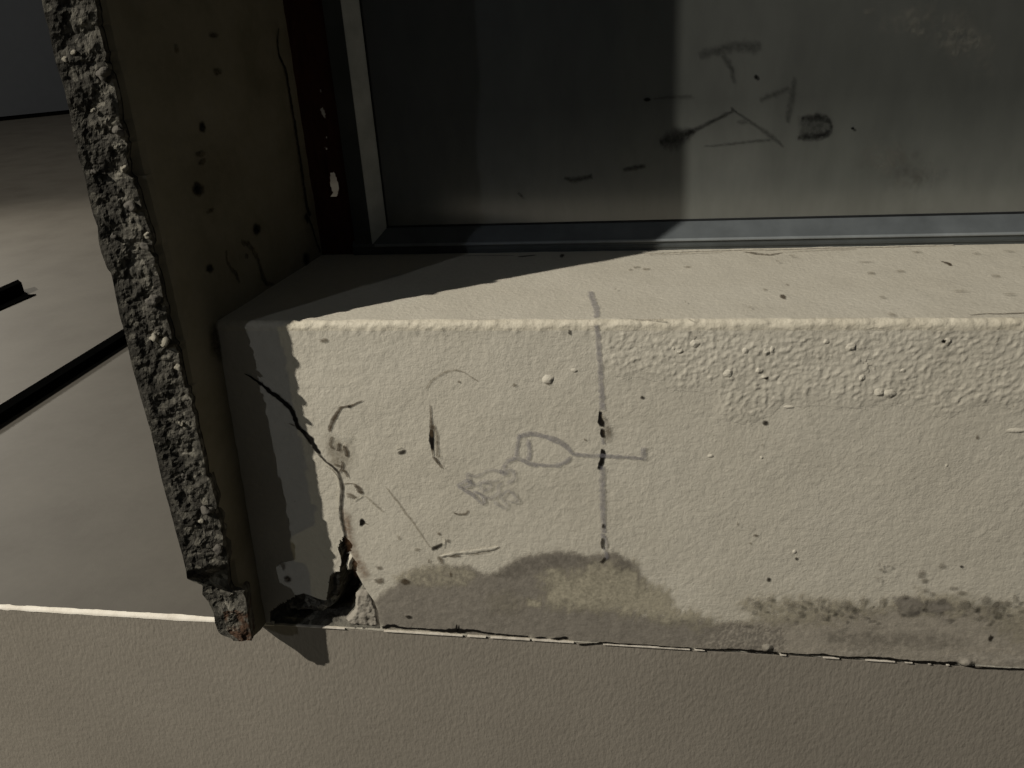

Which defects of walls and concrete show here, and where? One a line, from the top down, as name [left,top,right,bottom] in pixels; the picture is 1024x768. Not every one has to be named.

spalling [42,0,256,641]
crack [244,373,361,537]
spalling [269,537,382,628]
leakage [375,552,1024,667]
crack [382,624,1024,670]